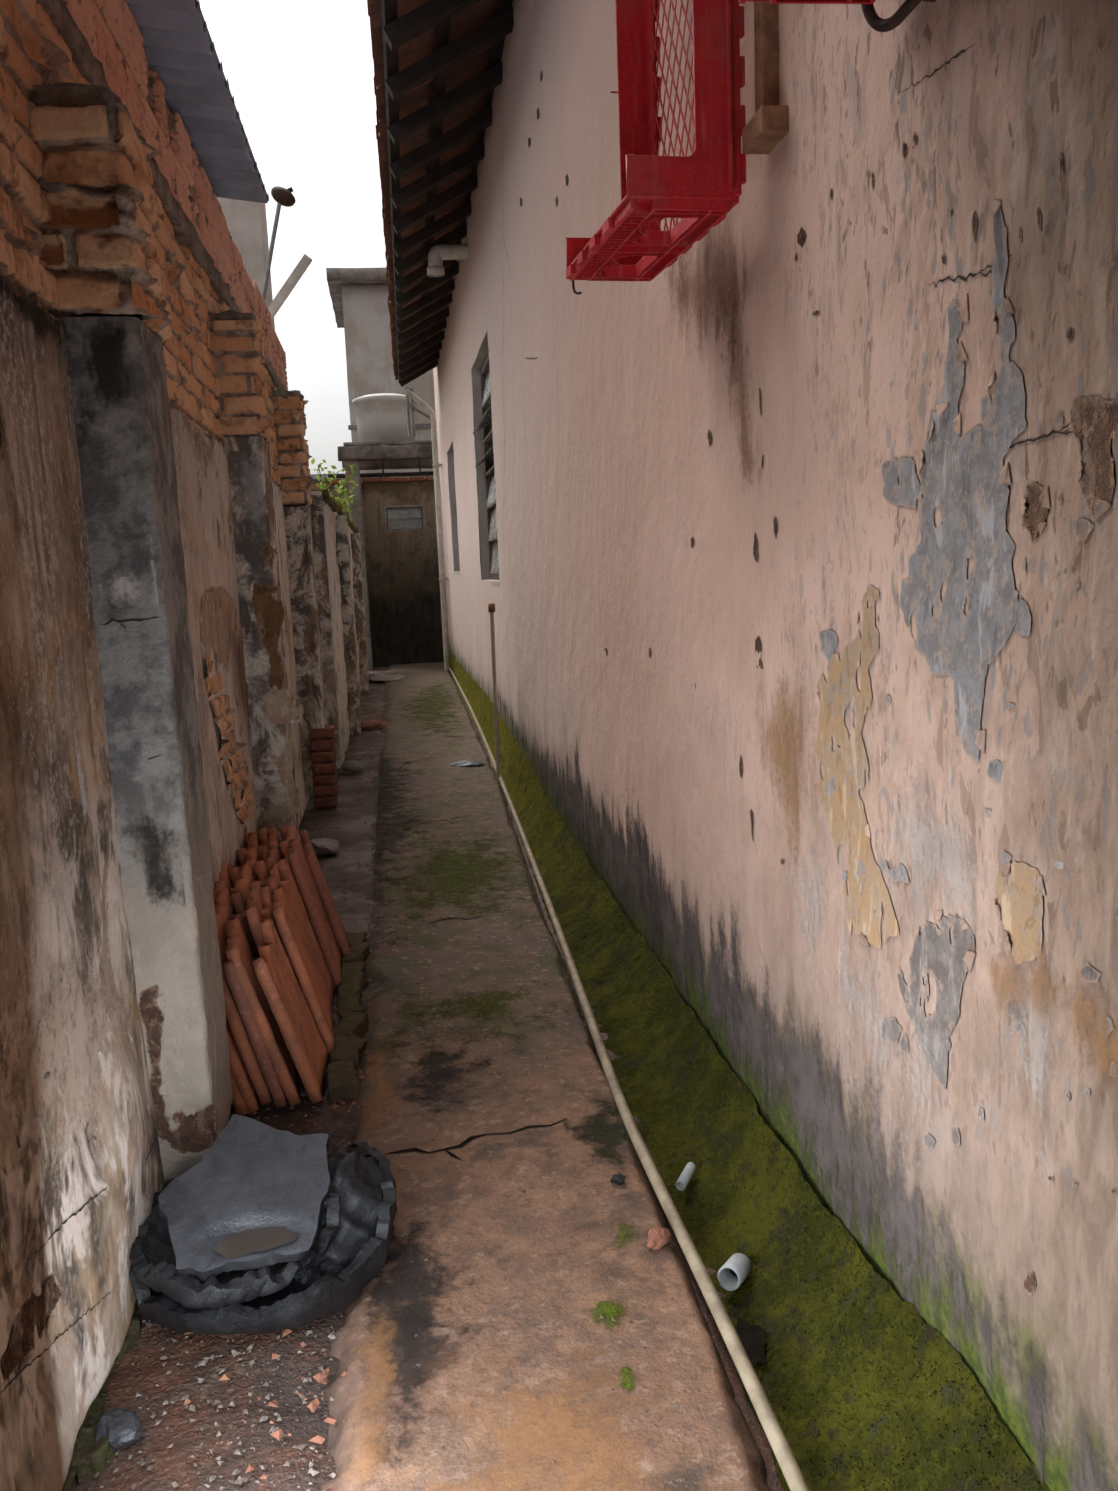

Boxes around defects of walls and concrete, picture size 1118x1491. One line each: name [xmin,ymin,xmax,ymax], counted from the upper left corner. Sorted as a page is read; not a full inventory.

flaking render [795,227,807,262]
water stain [0,273,66,541]
water stain [671,240,750,476]
flaking render [753,516,778,563]
peeling [882,200,1051,784]
flaking render [1070,396,1118,521]
flaking render [252,583,285,691]
flaking render [755,636,763,669]
peeling [816,585,976,1089]
crack [386,1118,568,1161]
water stain [498,690,1053,1481]
water stain [461,1376,638,1491]